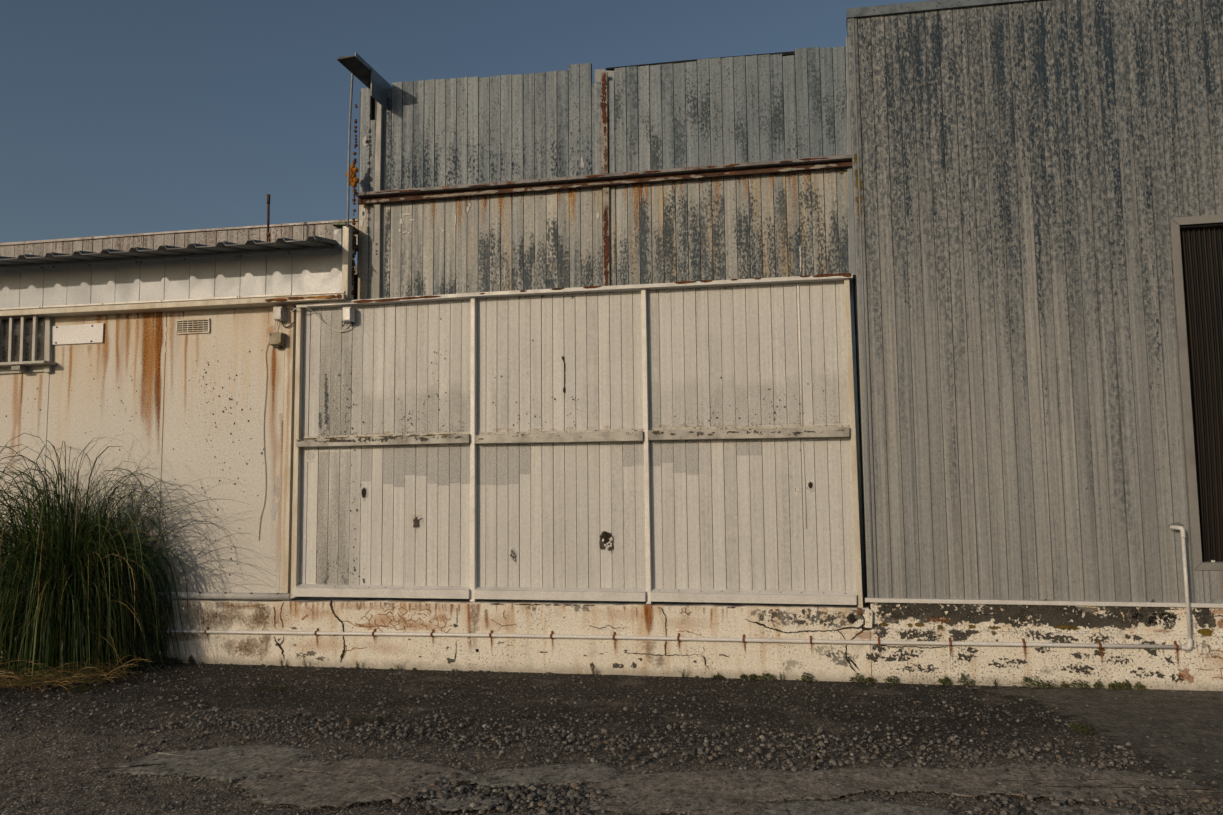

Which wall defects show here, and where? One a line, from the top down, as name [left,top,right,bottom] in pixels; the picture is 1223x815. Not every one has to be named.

damp [385,98,592,190]
corrosion [558,72,607,202]
damp [615,73,806,170]
corrosion [583,209,610,289]
damp [377,179,849,307]
damp [858,0,1223,402]
corrosion [142,312,163,423]
spalling [601,531,612,553]
crack [330,600,459,662]
corrosion [426,603,497,645]
crack [745,619,951,672]